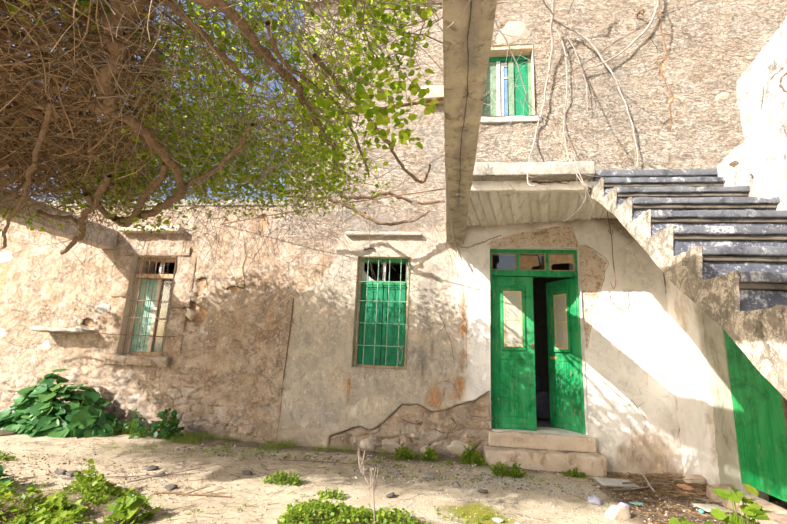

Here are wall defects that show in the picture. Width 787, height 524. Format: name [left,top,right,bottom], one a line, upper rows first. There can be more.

crack [455,0,474,203]
crack [648,0,683,133]
spalling [185,277,208,323]
spalling [487,225,608,348]
spalling [329,392,493,458]